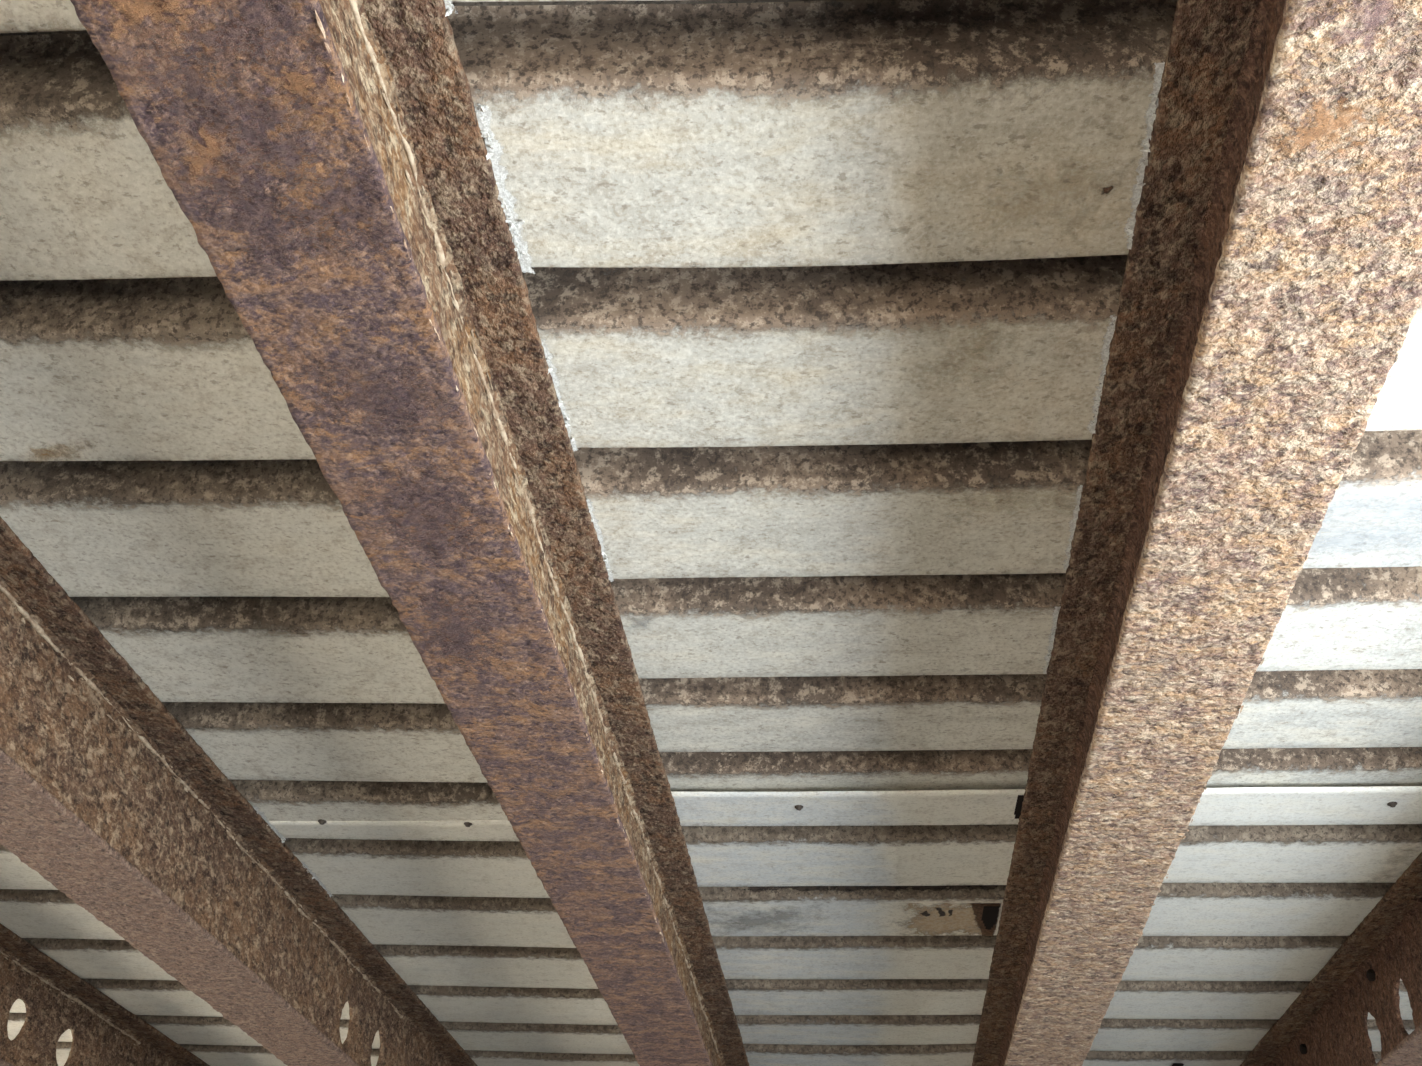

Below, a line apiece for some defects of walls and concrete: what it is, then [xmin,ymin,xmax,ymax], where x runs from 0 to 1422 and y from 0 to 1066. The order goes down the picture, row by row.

corrosion [91,0,351,132]
corrosion [177,112,254,188]
corrosion [1273,87,1389,159]
corrosion [278,130,416,273]
corrosion [294,352,467,443]
corrosion [359,463,513,569]
corrosion [404,585,504,672]